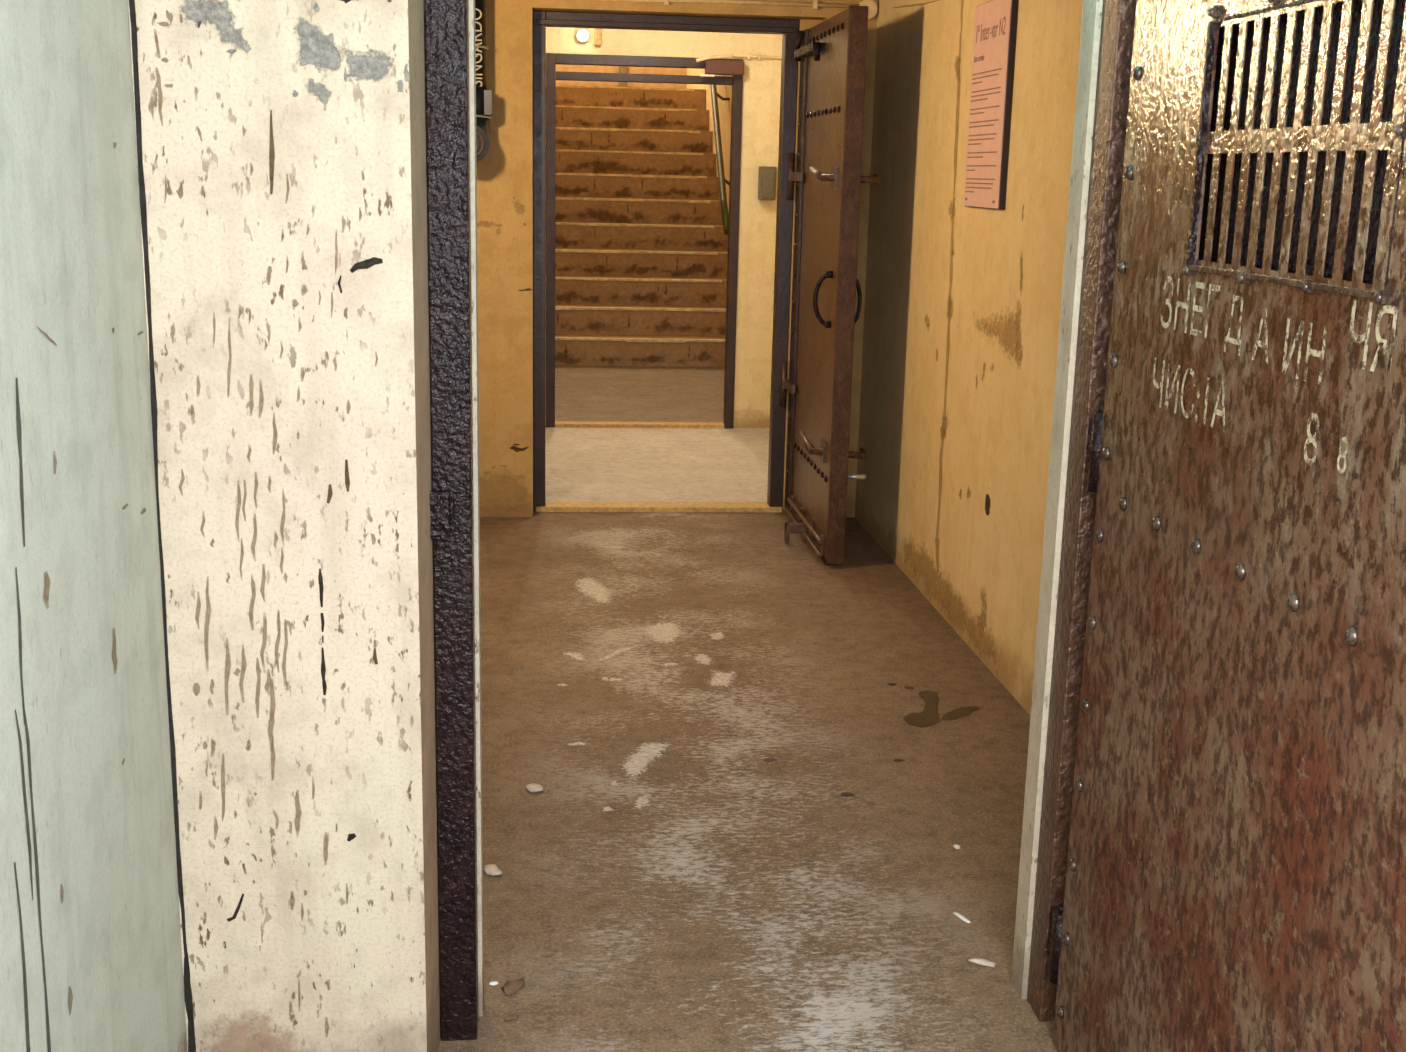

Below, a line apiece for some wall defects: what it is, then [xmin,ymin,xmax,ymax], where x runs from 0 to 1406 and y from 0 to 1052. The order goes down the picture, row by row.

spalling [154,0,251,124]
spalling [293,3,409,111]
water stain [905,545,994,655]
water stain [888,683,980,727]